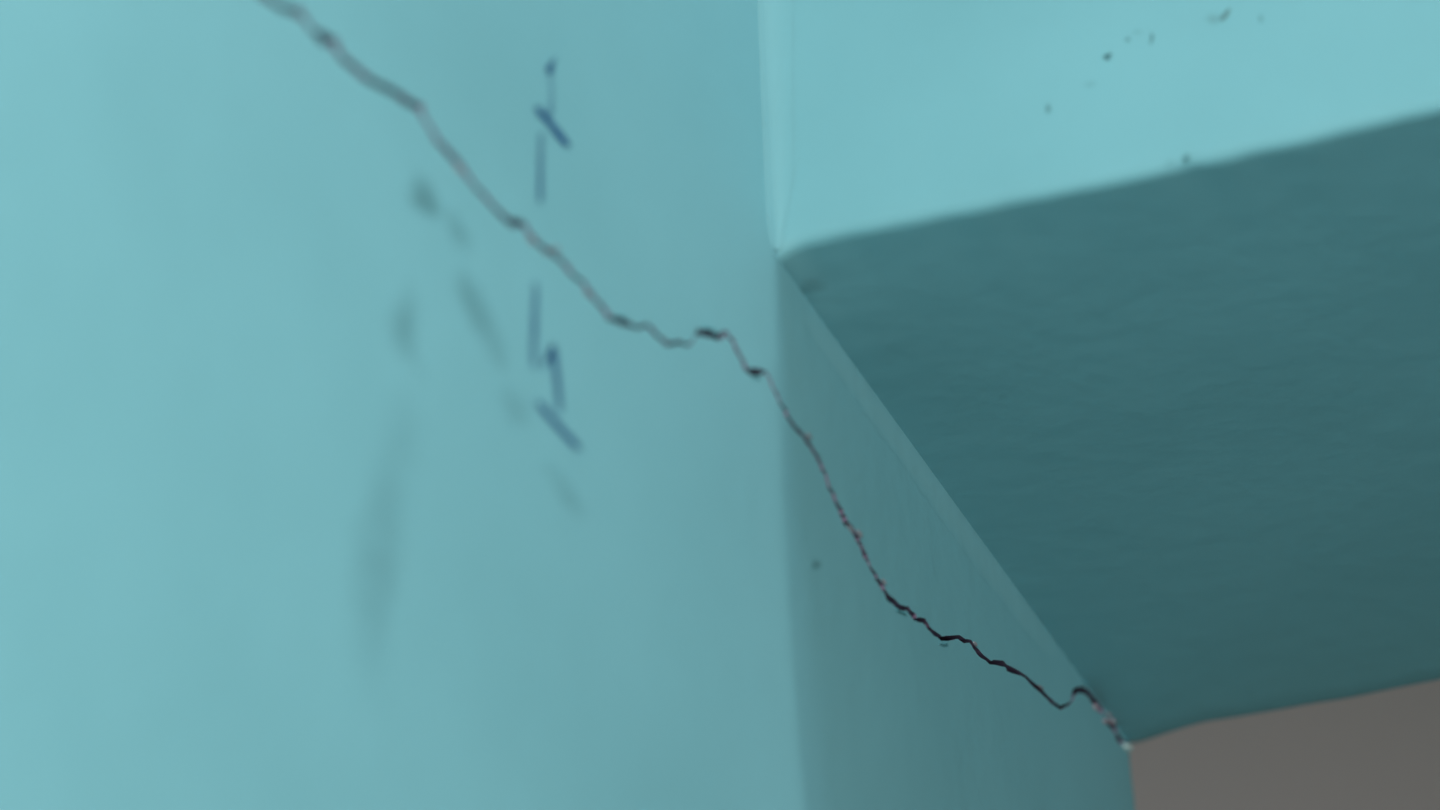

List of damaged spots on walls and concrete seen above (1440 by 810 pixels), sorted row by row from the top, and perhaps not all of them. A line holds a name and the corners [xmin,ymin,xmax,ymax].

crack [266,0,1124,745]